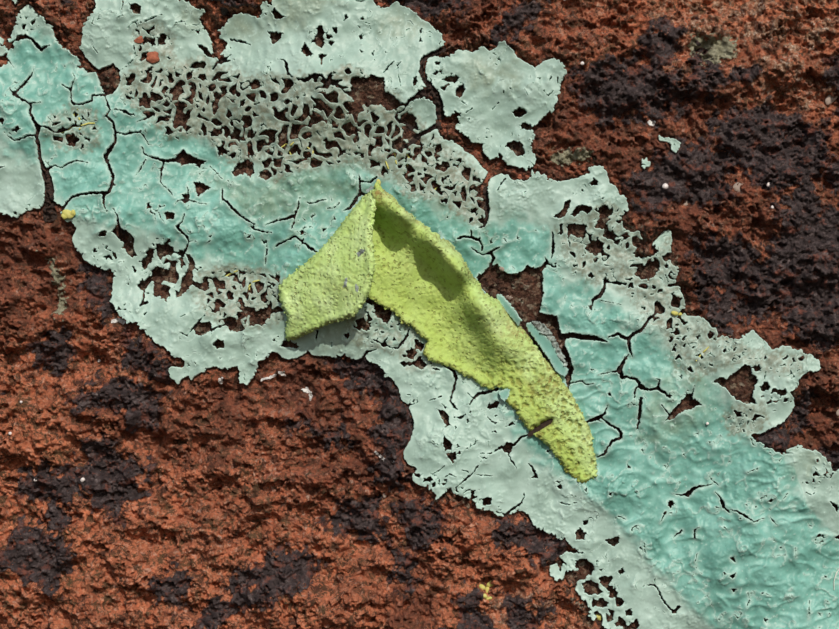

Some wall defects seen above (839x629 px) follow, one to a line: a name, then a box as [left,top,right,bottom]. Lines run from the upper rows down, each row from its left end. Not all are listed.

crack [281,59,342,86]
crack [395,47,504,153]
peeling [425,41,567,171]
peeling [66,133,79,147]
crack [10,76,377,264]
crack [457,178,506,268]
peeling [167,267,179,284]
crack [590,277,627,310]
crack [405,365,499,419]
crack [558,310,694,457]
crack [676,478,774,522]
peeling [607,586,624,607]